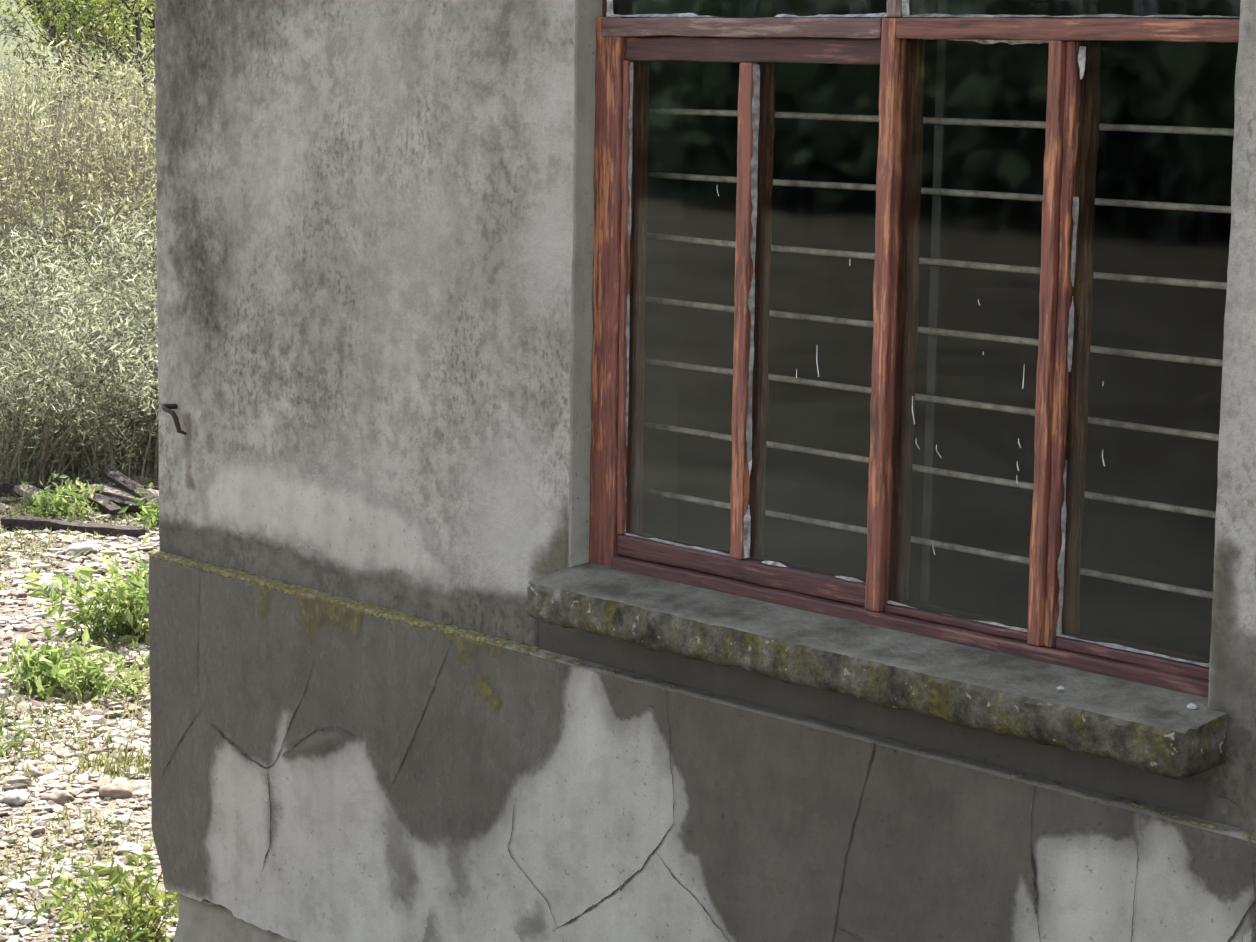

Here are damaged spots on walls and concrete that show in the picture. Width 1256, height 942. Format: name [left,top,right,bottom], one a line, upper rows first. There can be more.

damp [532,503,568,576]
crack [159,564,351,871]
crack [386,646,449,798]
damp [149,522,1256,942]
crack [508,686,730,942]
crack [832,742,875,942]
crack [1029,785,1040,938]
crack [1131,842,1139,942]
crack [1227,865,1256,942]